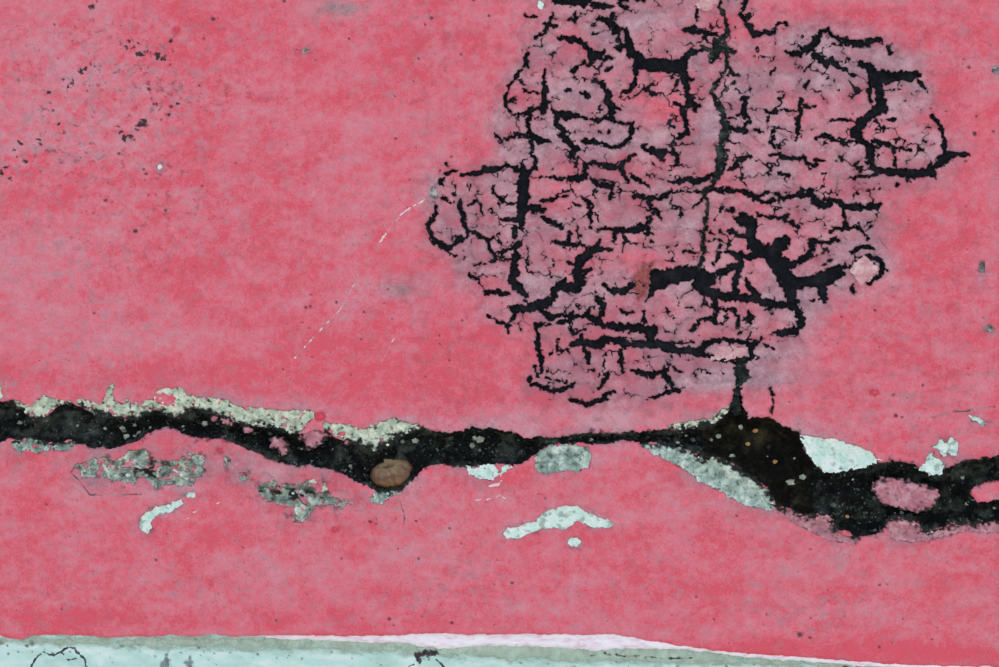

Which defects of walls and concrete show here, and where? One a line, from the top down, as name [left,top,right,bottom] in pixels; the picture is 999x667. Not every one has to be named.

crack [551,0,636,24]
crack [737,0,789,45]
crack [784,26,970,183]
crack [755,92,825,176]
crack [532,321,560,378]
crack [527,375,576,398]
crack [630,355,685,400]
flaking render [0,384,422,455]
flaking render [534,444,591,475]
flaking render [75,449,206,534]
flaking render [258,479,354,522]
flaking render [503,505,614,547]